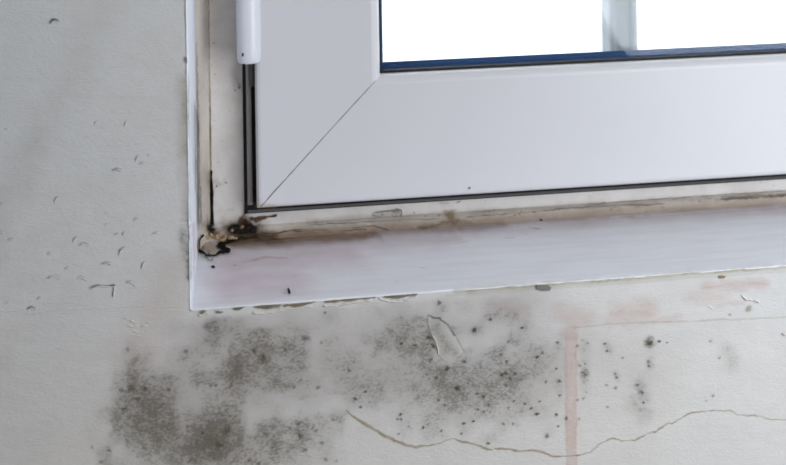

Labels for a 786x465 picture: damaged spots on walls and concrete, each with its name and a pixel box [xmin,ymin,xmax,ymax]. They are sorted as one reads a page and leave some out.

water stain [194,97,389,245]
peeling [427,315,463,361]
water stain [117,377,172,442]
water stain [188,415,240,462]
crack [348,412,561,457]